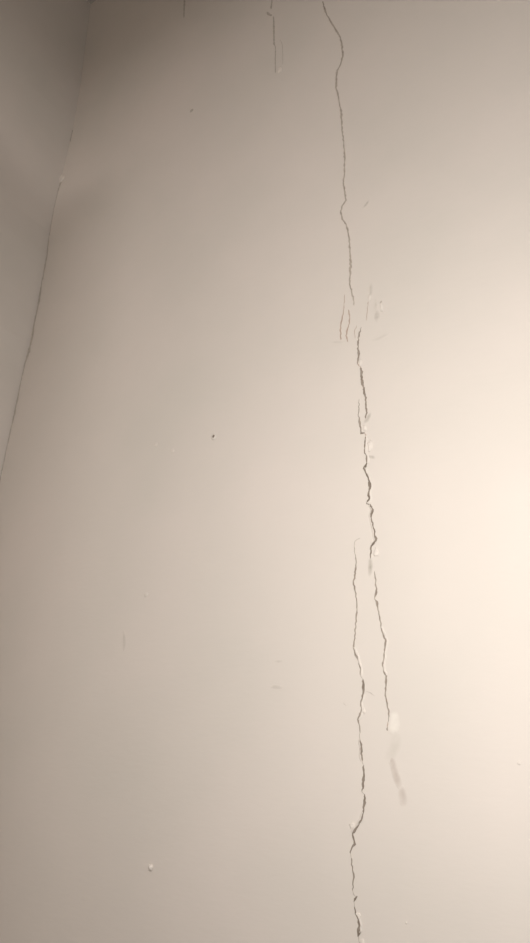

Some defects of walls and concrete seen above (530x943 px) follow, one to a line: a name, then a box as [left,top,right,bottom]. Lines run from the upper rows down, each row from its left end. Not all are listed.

crack [322,2,390,943]